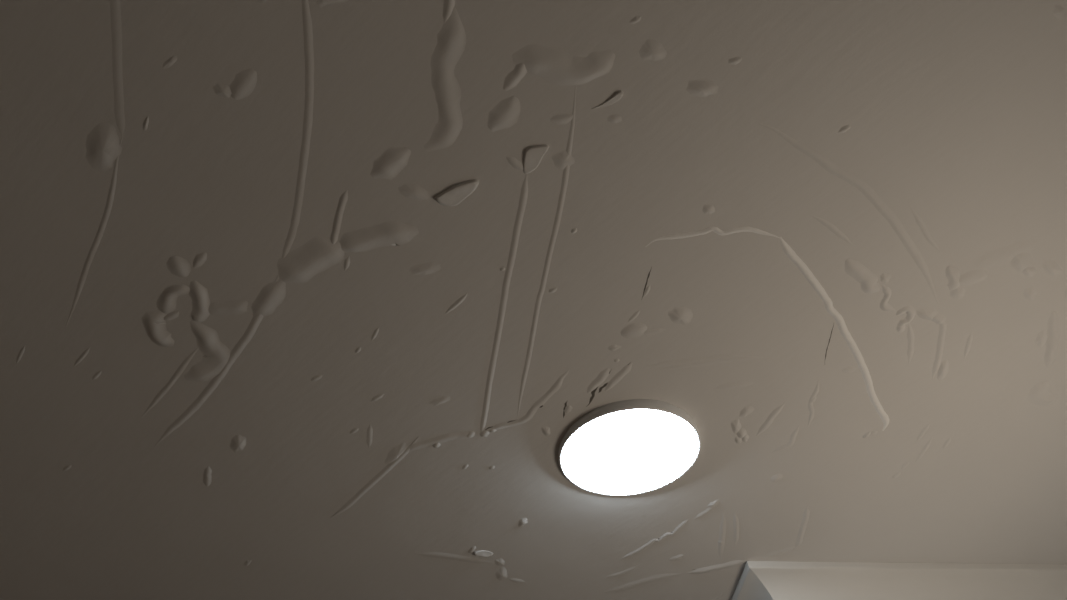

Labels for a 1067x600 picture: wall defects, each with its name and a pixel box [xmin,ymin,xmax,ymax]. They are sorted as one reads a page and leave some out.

crack [331,359,633,518]